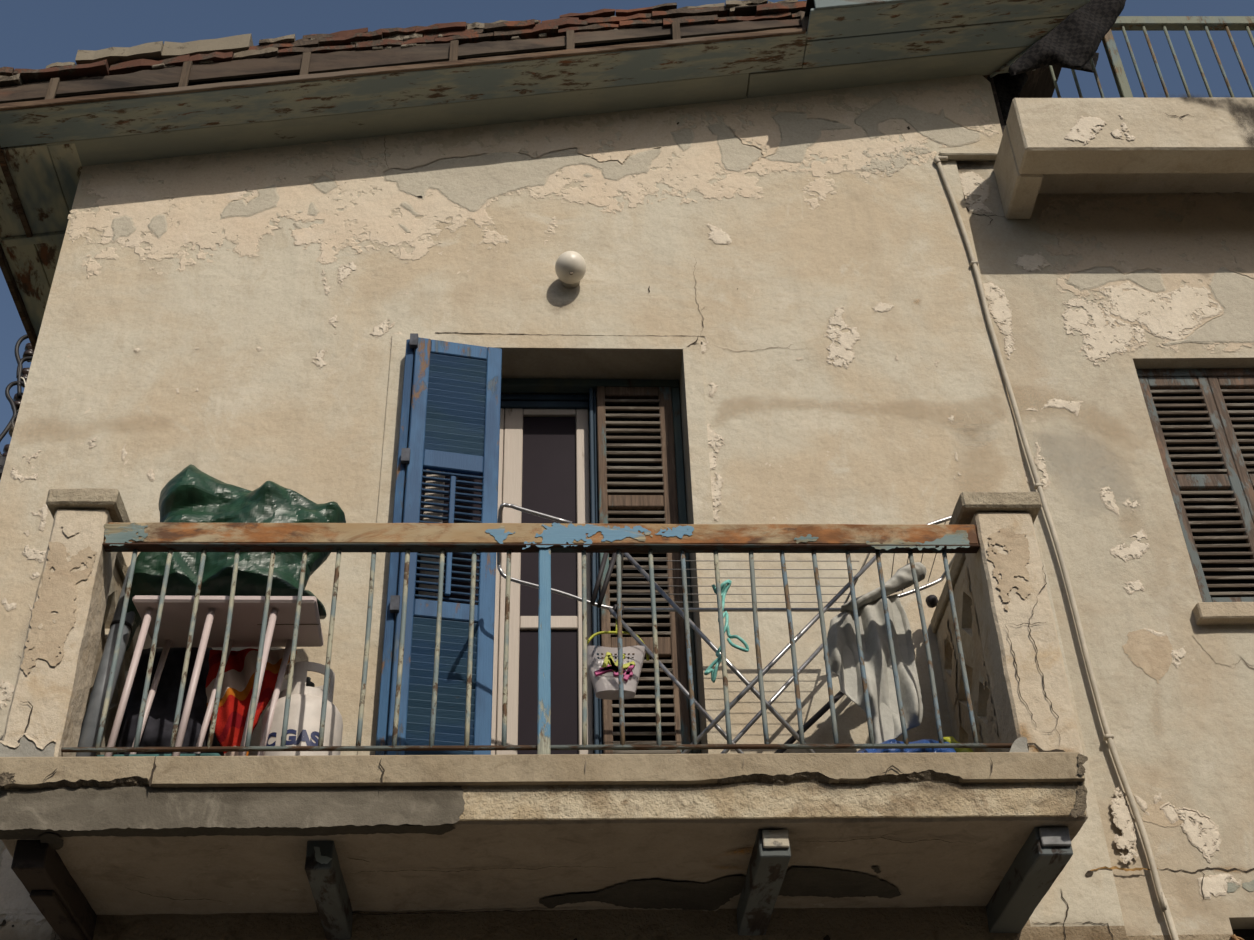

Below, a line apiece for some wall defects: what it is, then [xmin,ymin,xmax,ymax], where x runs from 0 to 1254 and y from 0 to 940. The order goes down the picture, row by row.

damp [1181,96,1254,147]
peeling [66,82,999,295]
peeling [824,307,861,369]
peeling [983,281,1017,360]
peeling [1014,193,1254,367]
flaking render [2,504,97,675]
flaking render [986,528,1031,610]
crack [20,701,38,739]
spalling [1071,754,1088,817]
peeling [1111,787,1254,899]